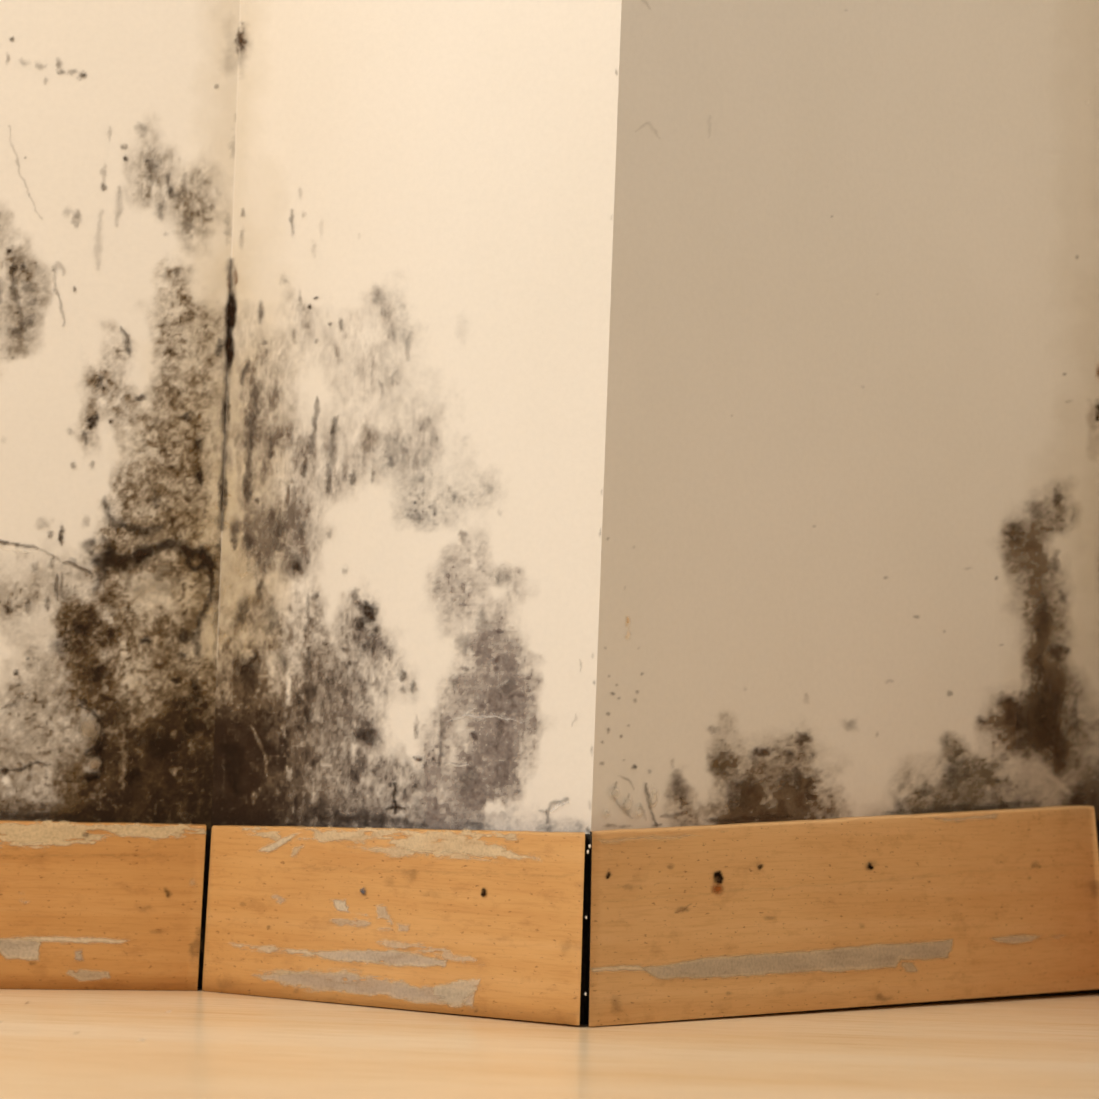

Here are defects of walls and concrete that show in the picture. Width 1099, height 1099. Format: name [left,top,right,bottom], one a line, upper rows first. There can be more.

leakage [145,160,212,222]
leakage [6,249,45,353]
leakage [0,267,540,831]
leakage [979,495,1099,821]
leakage [675,794,697,825]
leakage [710,735,837,825]
leakage [900,740,1038,814]
peeling [260,834,301,856]
peeling [22,937,125,981]
peeling [233,944,314,956]
peeling [258,970,480,1007]
peeling [334,900,476,961]